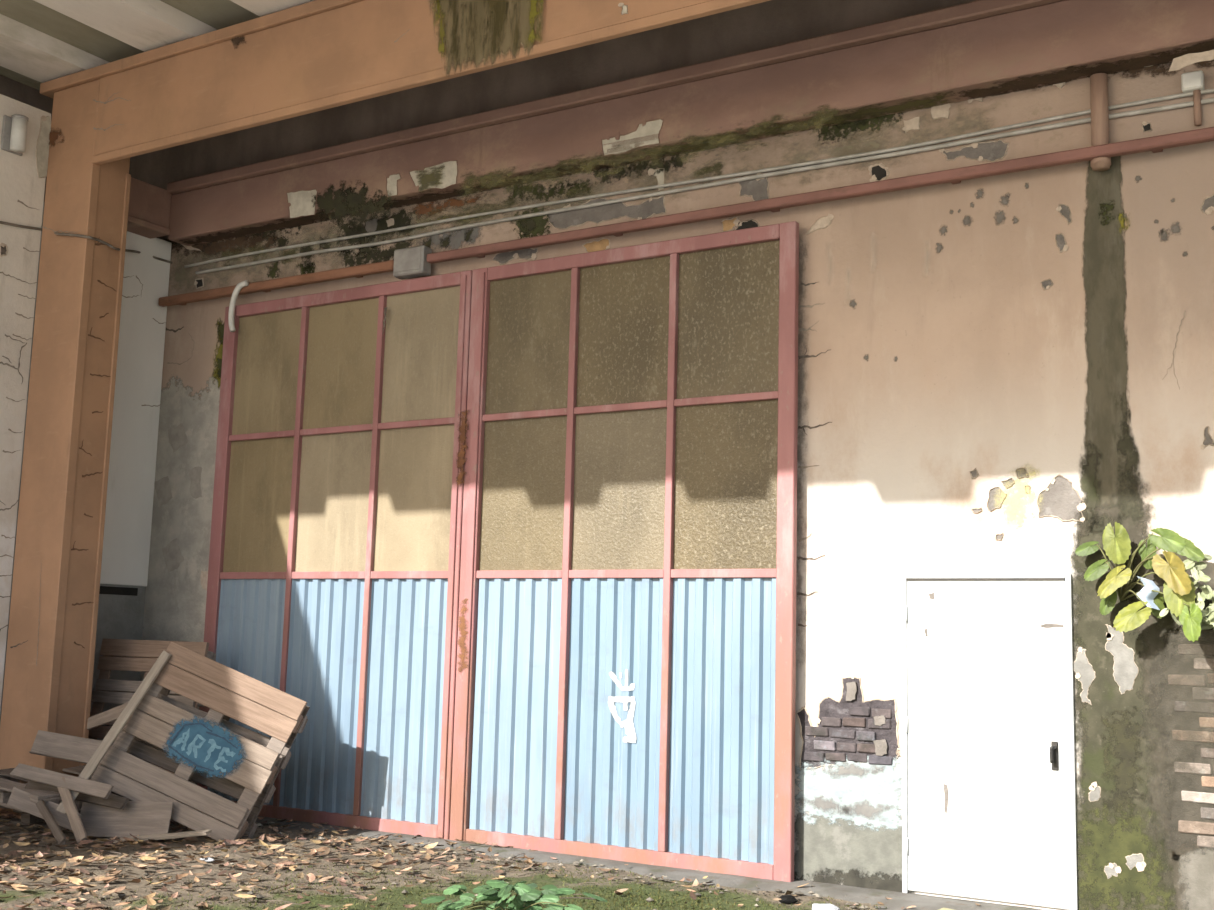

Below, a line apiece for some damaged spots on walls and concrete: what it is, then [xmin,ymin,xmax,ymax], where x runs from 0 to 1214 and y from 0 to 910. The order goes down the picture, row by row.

water stain [430,0,544,74]
water stain [165,160,641,259]
crack [88,280,116,341]
crack [0,334,27,433]
crack [79,441,102,477]
peeling [142,376,220,642]
rust [456,410,469,484]
spalling [972,467,1086,523]
water stain [1072,156,1213,910]
rust [457,599,468,672]
spalling [795,675,902,831]
flaking render [1105,624,1214,851]